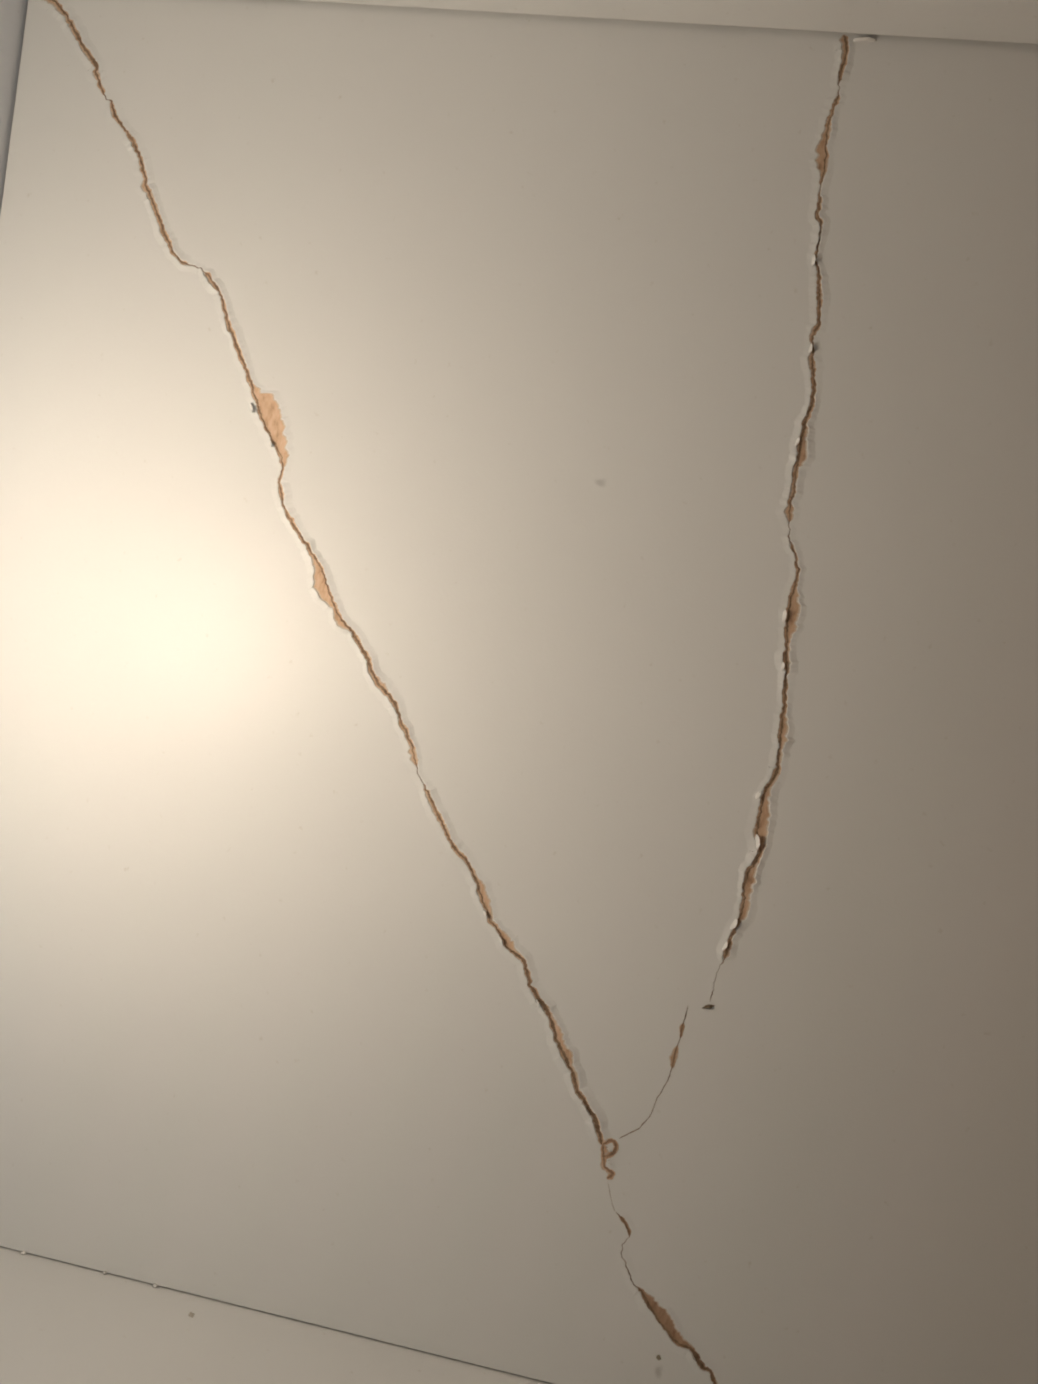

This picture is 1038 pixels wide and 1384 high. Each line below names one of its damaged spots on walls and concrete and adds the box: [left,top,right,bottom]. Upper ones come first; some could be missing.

crack [31,0,856,1384]